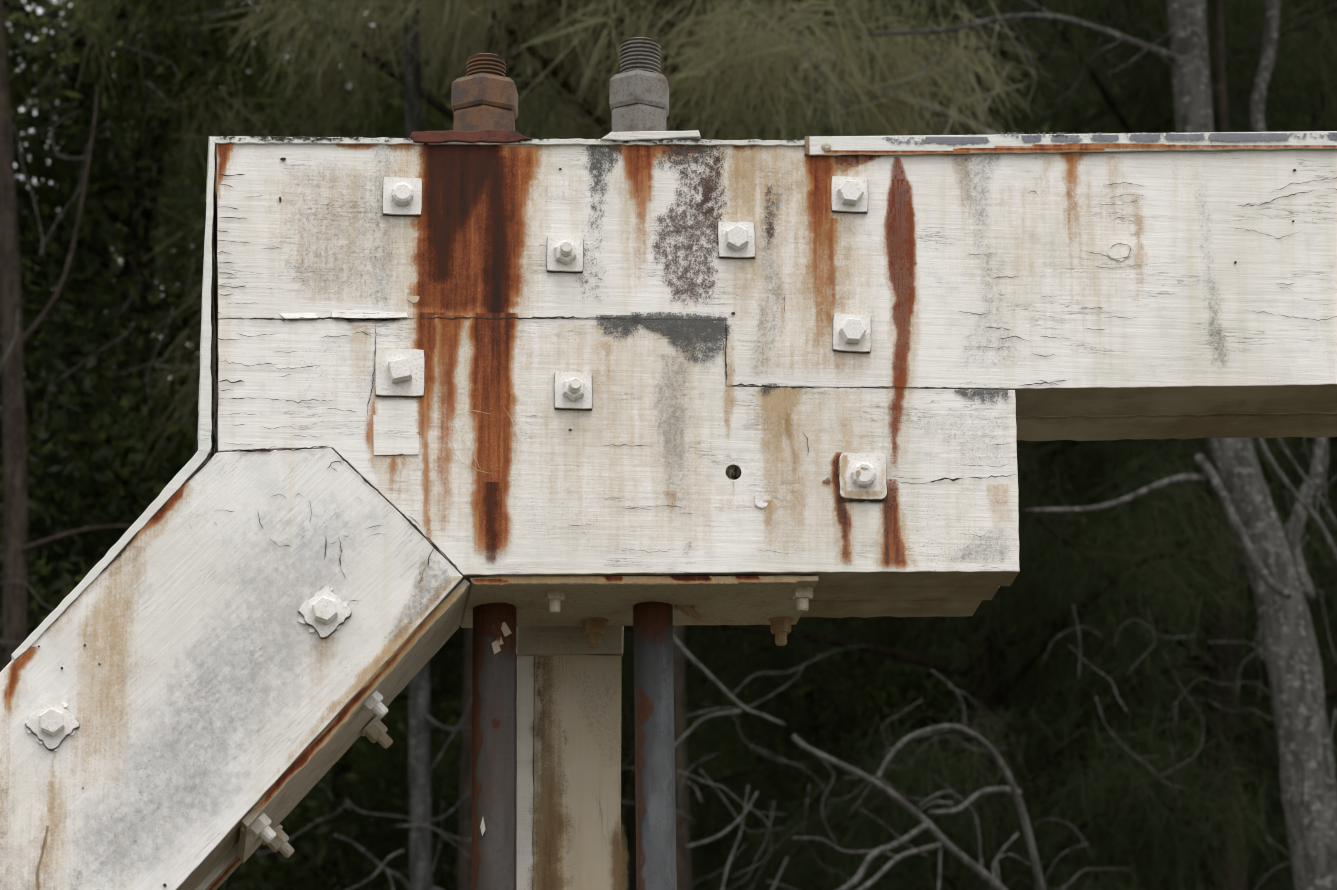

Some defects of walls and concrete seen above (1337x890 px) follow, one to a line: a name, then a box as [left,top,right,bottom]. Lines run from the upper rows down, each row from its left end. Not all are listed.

corrosion [259,144,815,806]
damp [579,145,622,298]
damp [593,145,737,507]
damp [743,146,799,509]
corrosion [805,143,1337,567]
corrosion [4,646,37,711]
corrosion [471,603,517,890]
corrosion [612,686,651,890]